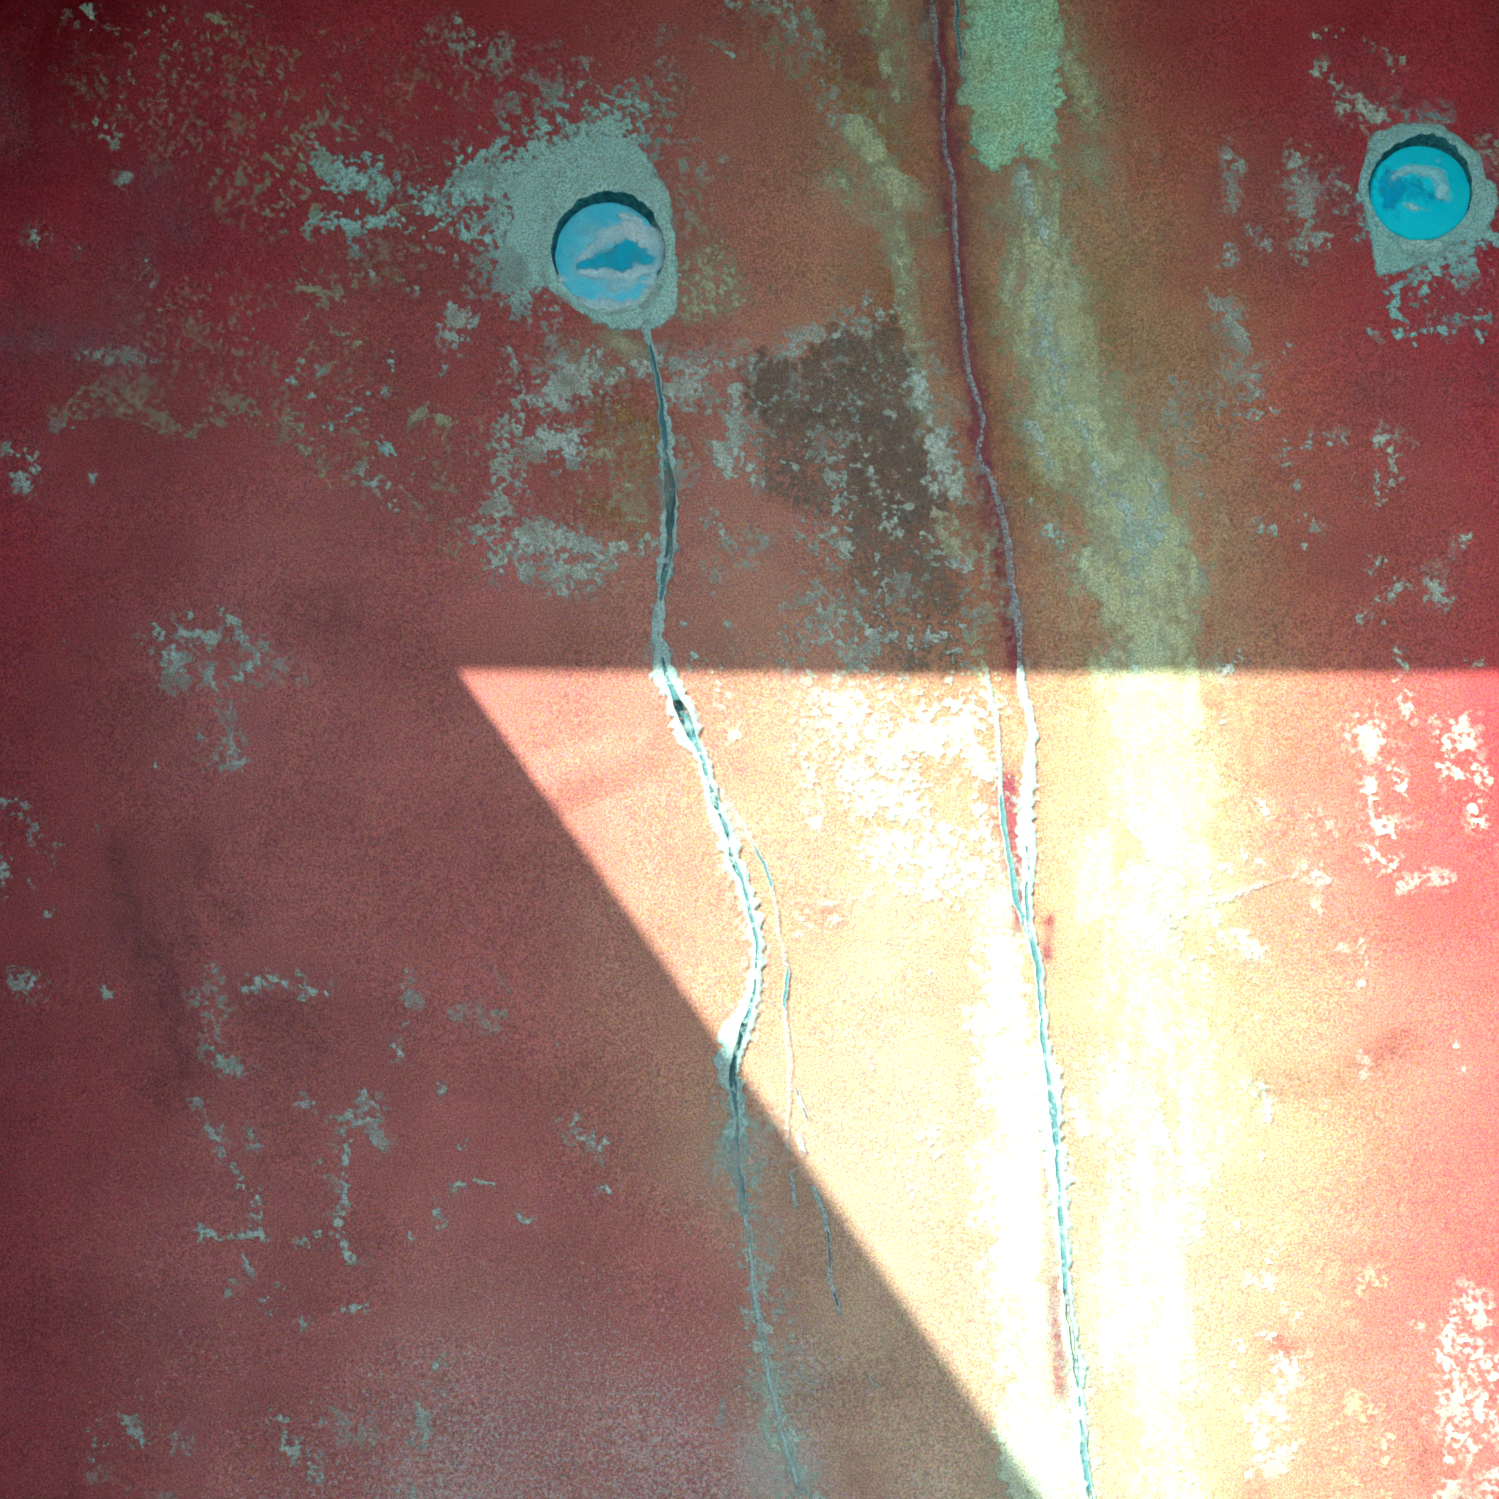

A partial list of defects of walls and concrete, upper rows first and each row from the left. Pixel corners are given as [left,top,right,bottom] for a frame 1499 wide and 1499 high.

peeling [436,300,479,348]
peeling [266,79,705,325]
leakage [737,0,966,687]
peeling [1221,151,1333,266]
peeling [1310,62,1451,170]
peeling [1334,179,1499,347]
peeling [140,607,276,714]
peeling [458,215,1004,918]
crack [930,0,1096,1499]
leakage [925,0,1265,1499]
crack [641,322,841,1499]
peeling [1437,1290,1499,1463]